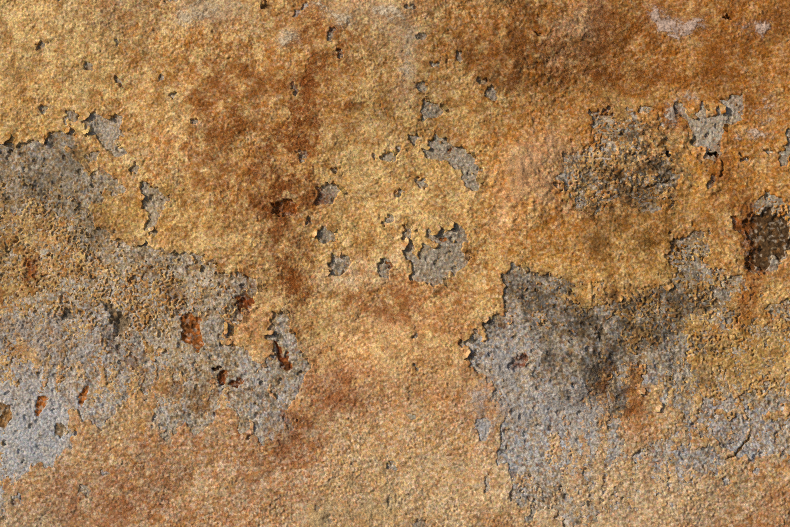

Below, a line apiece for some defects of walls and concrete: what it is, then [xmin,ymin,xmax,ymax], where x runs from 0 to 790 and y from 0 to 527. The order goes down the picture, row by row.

rust [249,156,291,239]
peeling [373,146,401,162]
peeling [408,82,483,191]
peeling [554,106,680,215]
peeling [674,95,744,163]
peeling [378,258,394,279]
peeling [401,220,471,287]
peeling [0,110,312,520]
peeling [458,192,790,527]